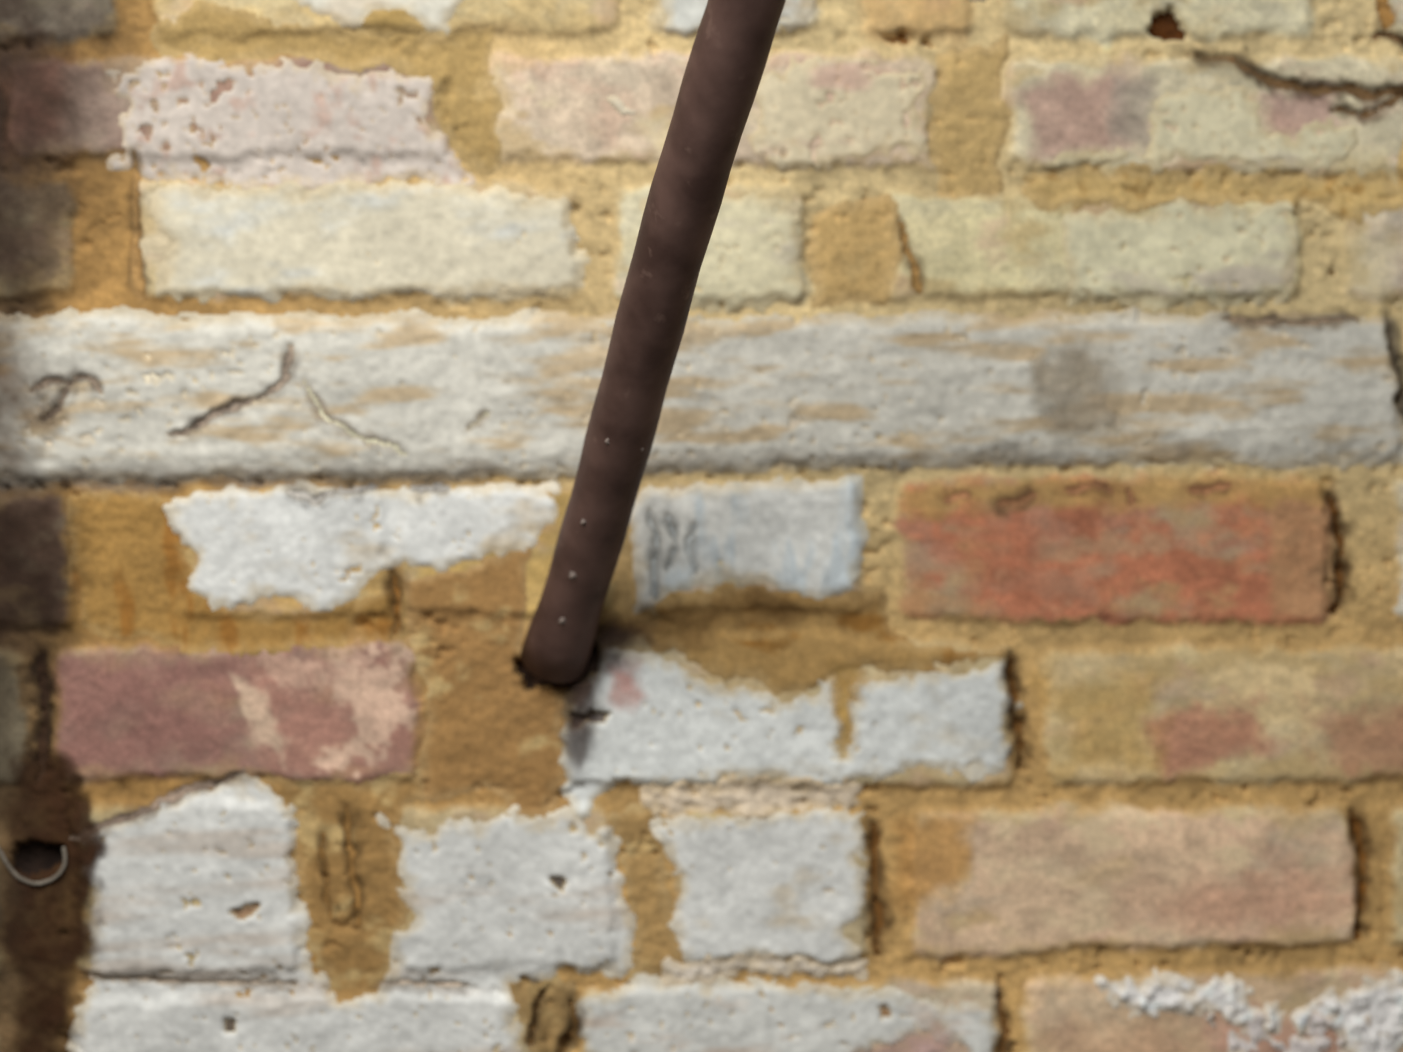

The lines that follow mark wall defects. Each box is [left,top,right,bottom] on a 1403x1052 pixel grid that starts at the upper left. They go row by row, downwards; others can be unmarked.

damp [0,0,73,296]
peeling [105,0,591,304]
crack [1186,51,1403,120]
crack [1371,0,1403,46]
peeling [643,85,1403,475]
crack [29,375,103,422]
crack [168,344,451,505]
damp [0,504,62,642]
peeling [0,305,1024,1052]
damp [2,755,103,1052]
crack [526,990,581,1052]
damp [1093,967,1403,1052]